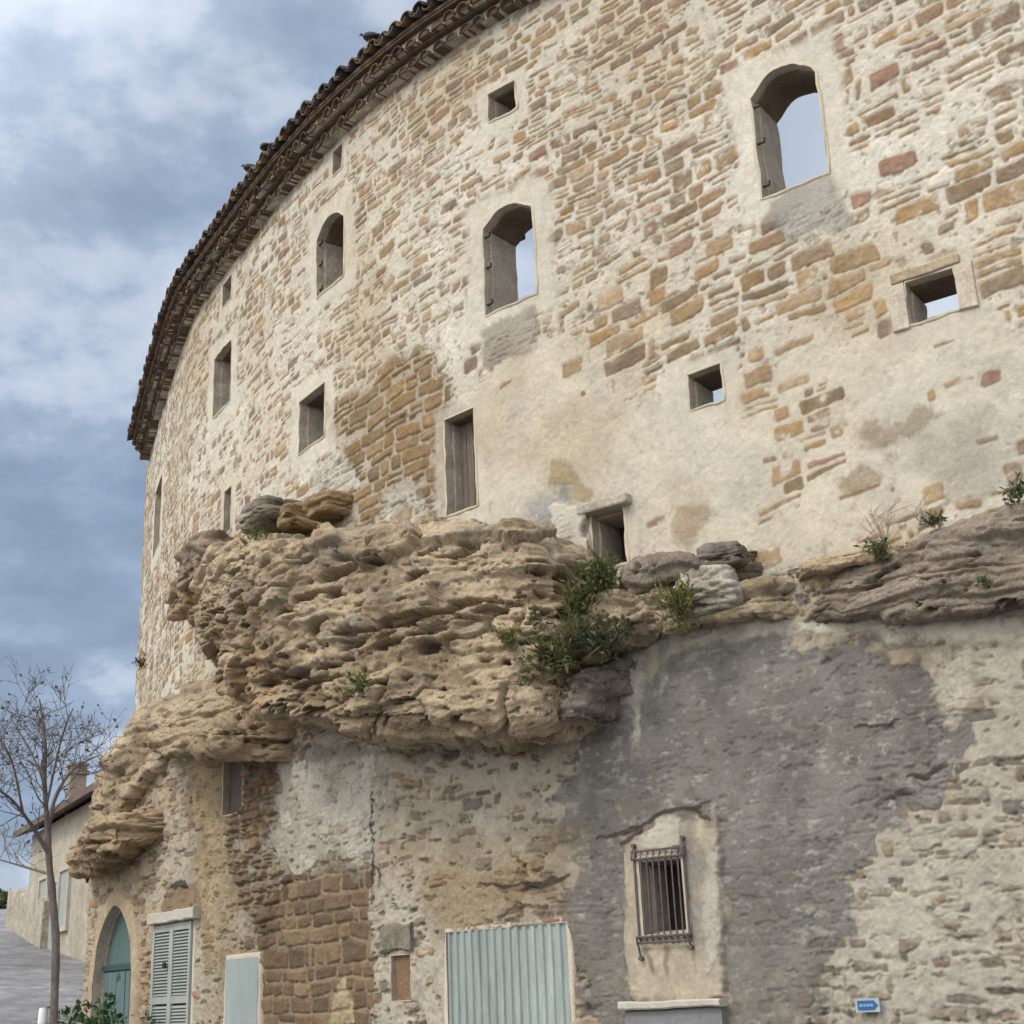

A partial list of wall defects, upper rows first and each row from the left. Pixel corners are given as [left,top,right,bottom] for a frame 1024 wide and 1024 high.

flaking render [227,740,397,1024]
crack [369,791,381,903]
crack [596,800,711,845]
damp [426,615,1024,1024]